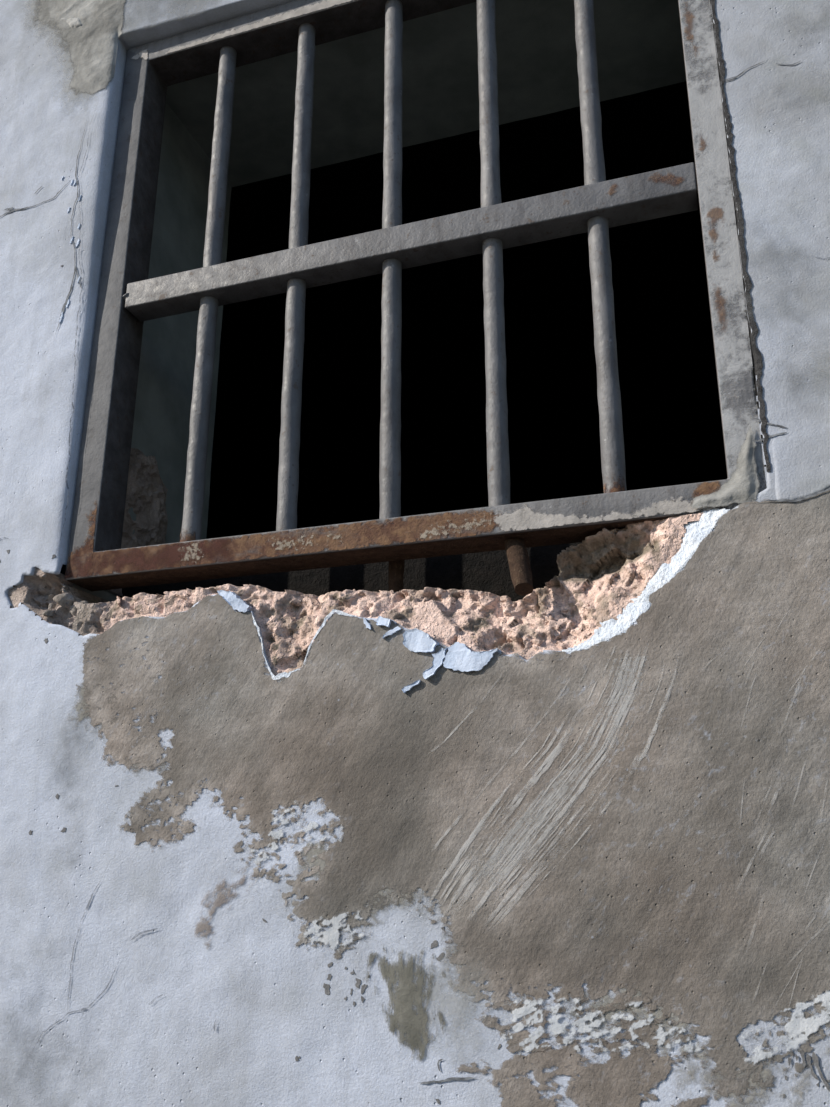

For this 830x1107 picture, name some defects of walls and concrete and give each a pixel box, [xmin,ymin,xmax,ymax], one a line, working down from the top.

rust [685,12,697,49]
crack [0,120,87,344]
rust [707,208,723,259]
peeling [59,140,88,489]
rust [715,288,726,329]
flaking render [121,447,168,549]
rust [65,503,677,591]
rust [604,478,625,493]
peeling [8,490,830,1107]
crack [28,868,118,1056]